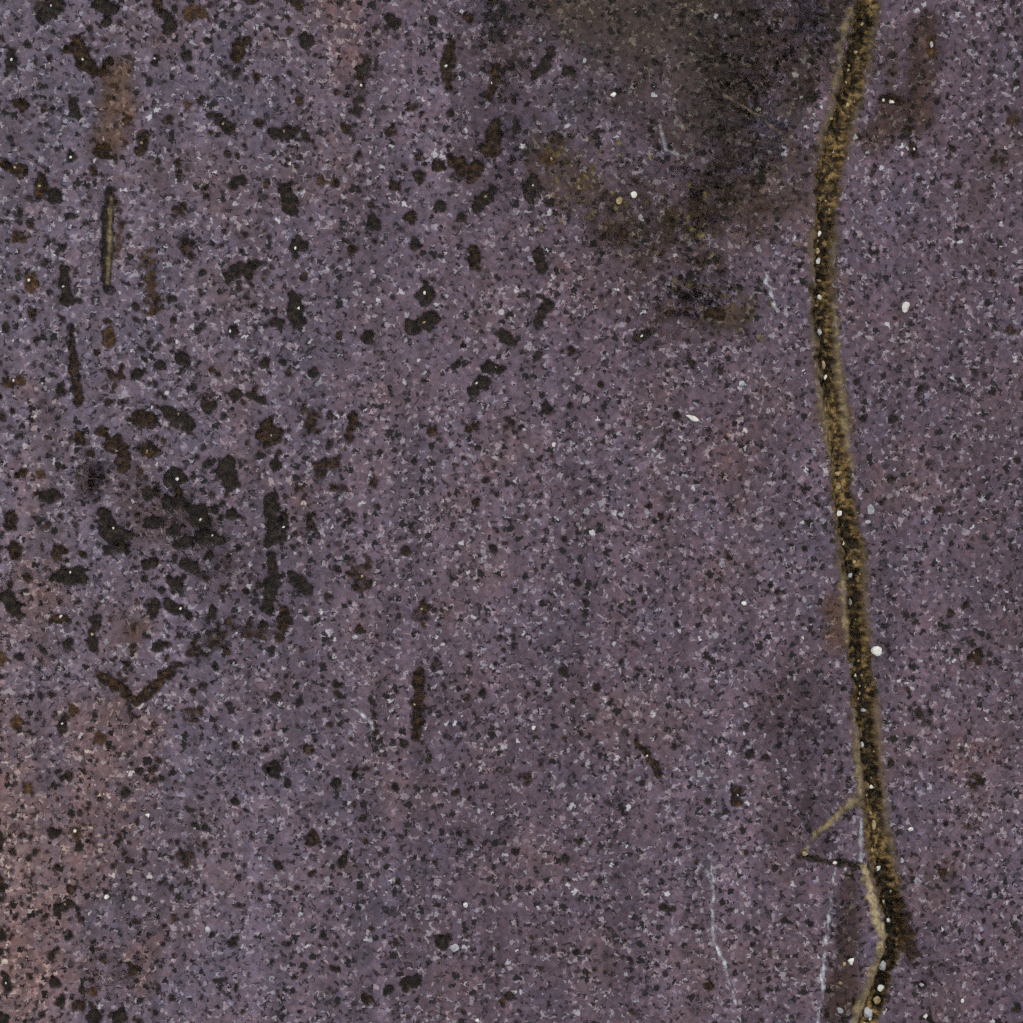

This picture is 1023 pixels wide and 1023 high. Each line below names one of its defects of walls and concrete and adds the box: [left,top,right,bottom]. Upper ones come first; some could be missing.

damp [520,0,757,138]
crack [724,0,920,1023]
crack [710,866,736,1004]